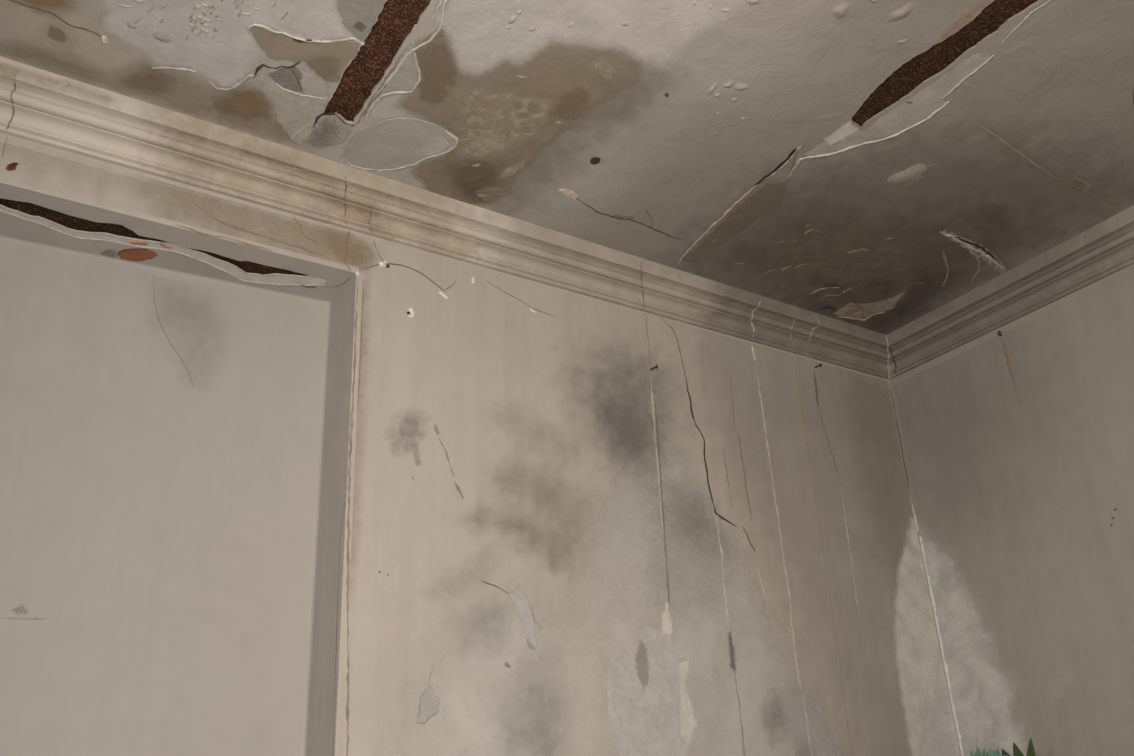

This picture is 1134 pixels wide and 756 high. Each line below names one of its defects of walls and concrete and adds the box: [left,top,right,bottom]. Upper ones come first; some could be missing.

leakage [13,0,123,57]
flaking render [209,0,562,171]
leakage [404,34,637,203]
flaking render [788,0,1052,178]
corrosion [0,198,169,261]
flaking render [0,207,327,288]
corrosion [190,248,309,276]
crack [559,145,802,277]
crack [640,262,767,600]
leakage [402,447,836,756]
leakage [895,505,1026,756]